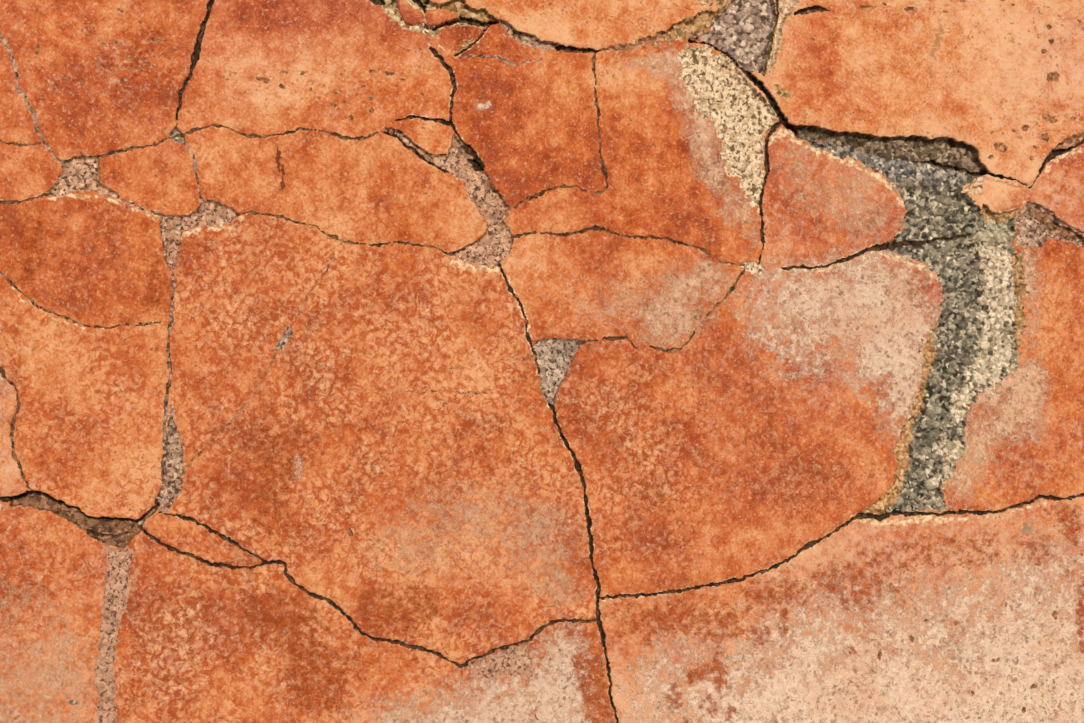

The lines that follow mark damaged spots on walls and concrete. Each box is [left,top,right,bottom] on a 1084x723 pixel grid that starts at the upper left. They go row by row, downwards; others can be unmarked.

flaking render [368,0,560,52]
crack [0,192,54,205]
crack [0,35,66,168]
flaking render [385,127,515,268]
crack [97,0,971,354]
flaking render [599,0,830,213]
crack [913,138,1084,236]
flaking render [1029,113,1084,160]
flaking render [533,338,580,405]
flaking render [789,124,1084,515]
crack [0,263,1084,723]
flaking render [0,405,185,723]